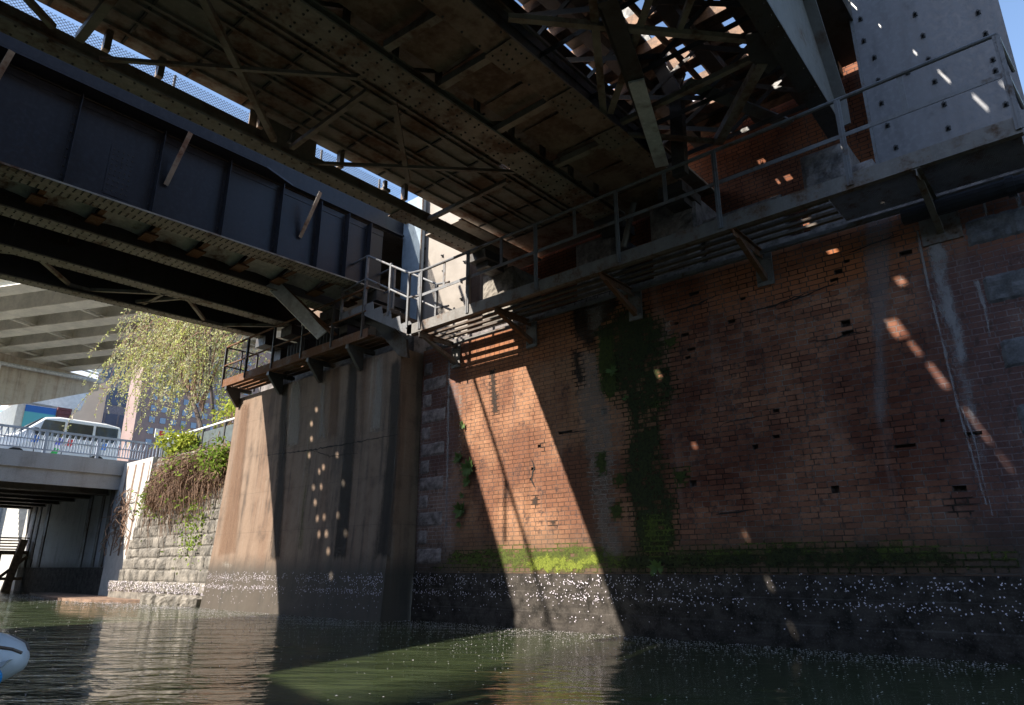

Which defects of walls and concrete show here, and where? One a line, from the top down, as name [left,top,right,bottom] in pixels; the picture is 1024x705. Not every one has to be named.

water stain [916,231,992,517]